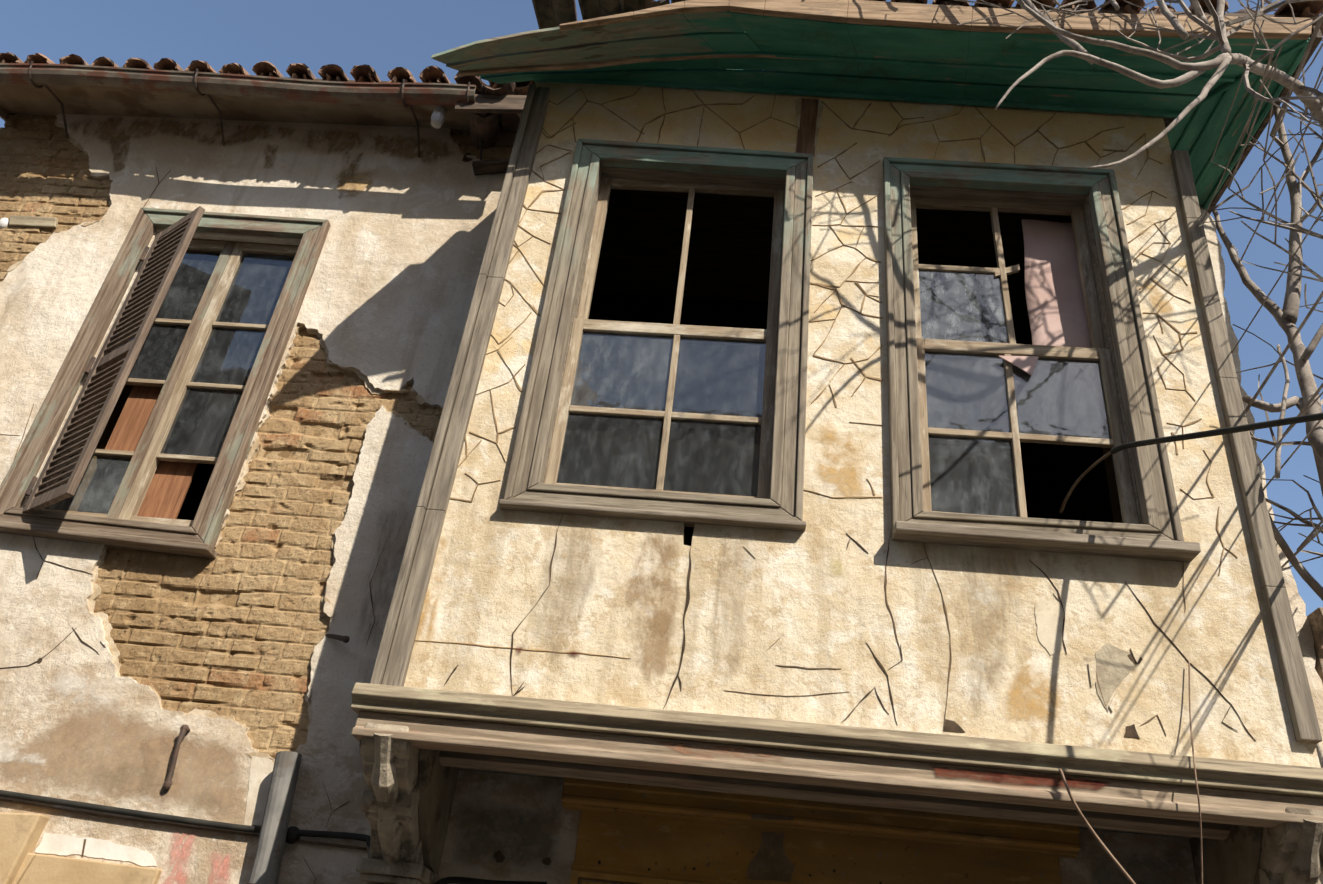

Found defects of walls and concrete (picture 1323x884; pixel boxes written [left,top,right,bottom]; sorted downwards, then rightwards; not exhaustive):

flaking render [0,114,112,283]
crack [0,404,34,486]
crack [0,627,99,669]
crack [33,537,91,580]
flaking render [88,324,442,759]
crack [416,514,622,696]
crack [663,549,691,709]
crack [725,532,952,727]
crack [1029,560,1067,655]
spalling [1088,644,1141,712]
peeling [1124,724,1140,739]
crack [1125,562,1256,741]